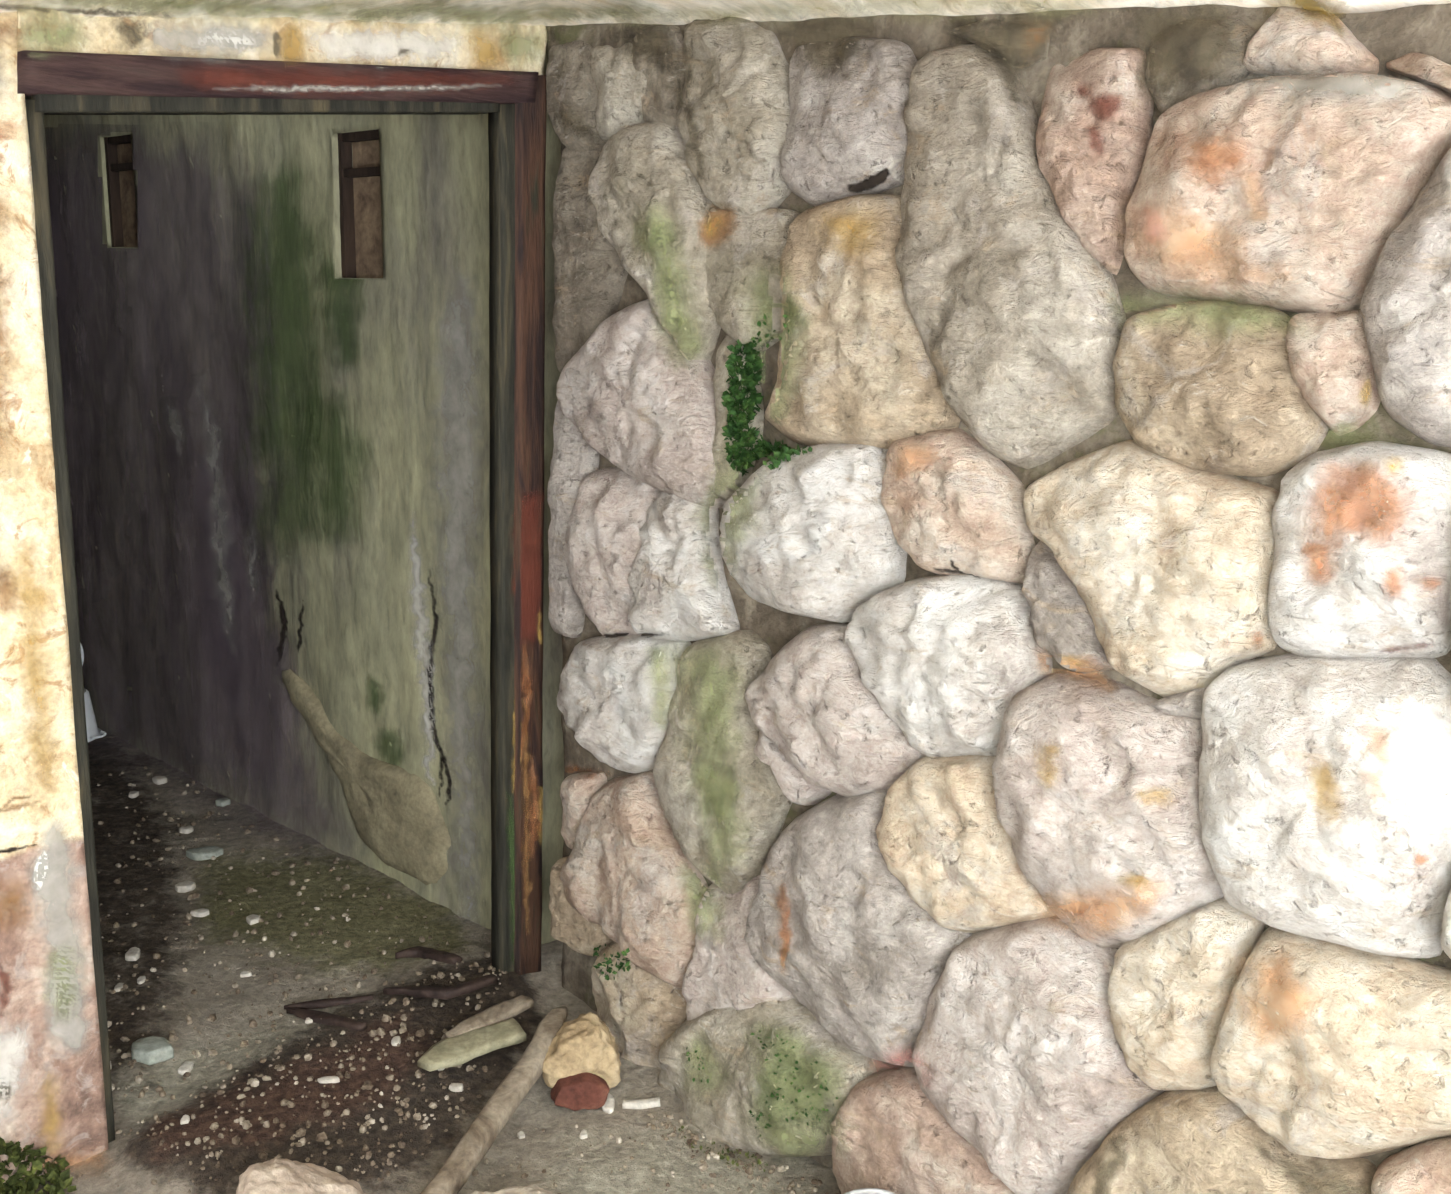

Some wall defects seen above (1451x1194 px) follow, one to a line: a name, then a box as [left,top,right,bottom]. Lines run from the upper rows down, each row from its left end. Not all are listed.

damp [46,129,361,833]
crack [276,591,304,661]
crack [426,578,452,804]
rust [520,498,541,640]
crack [5,797,29,811]
crack [0,845,35,853]